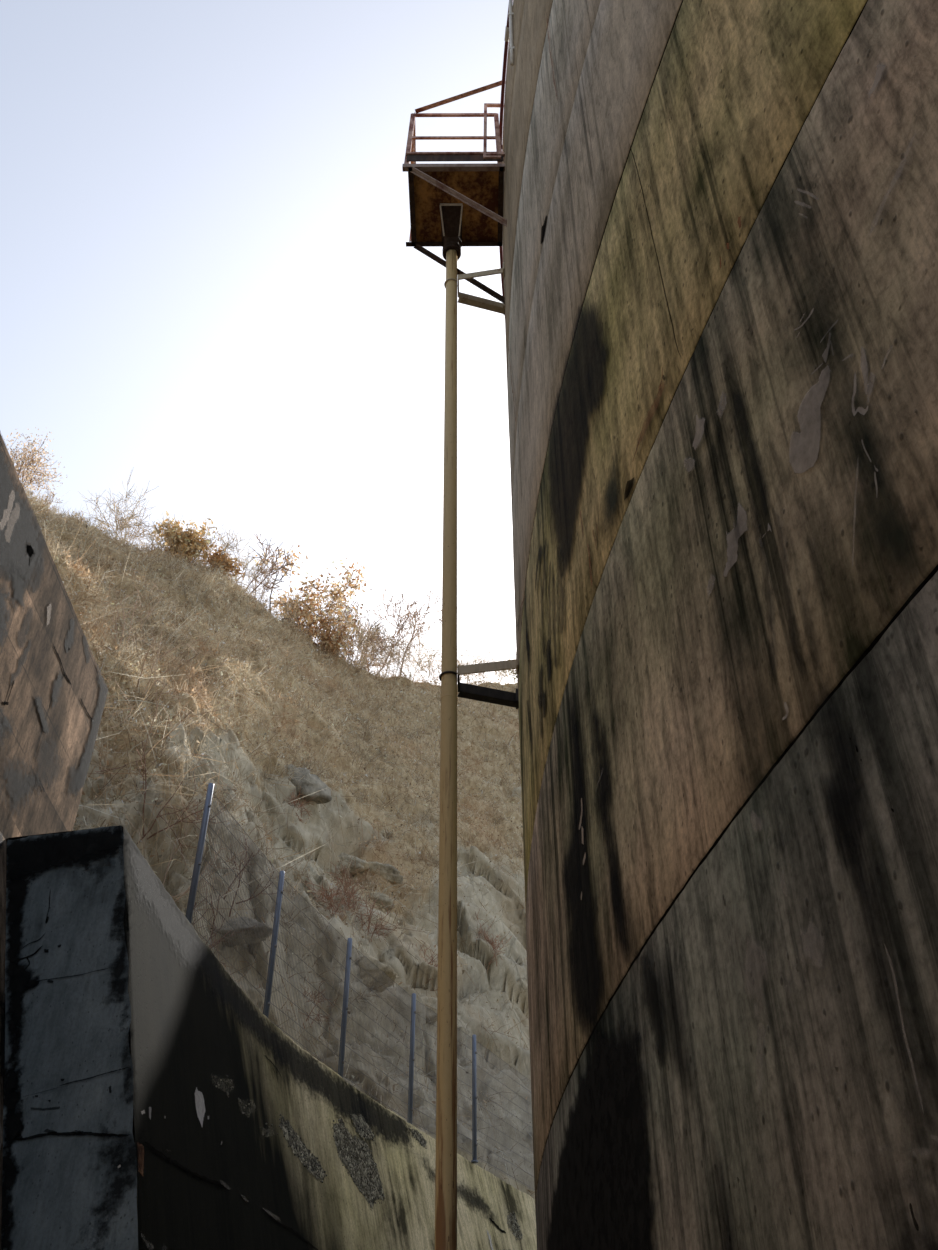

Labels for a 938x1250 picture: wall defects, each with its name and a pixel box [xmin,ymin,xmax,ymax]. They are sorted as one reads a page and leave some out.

peeling [789,320,838,473]
leakage [0,437,45,646]
peeling [194,1087,205,1126]